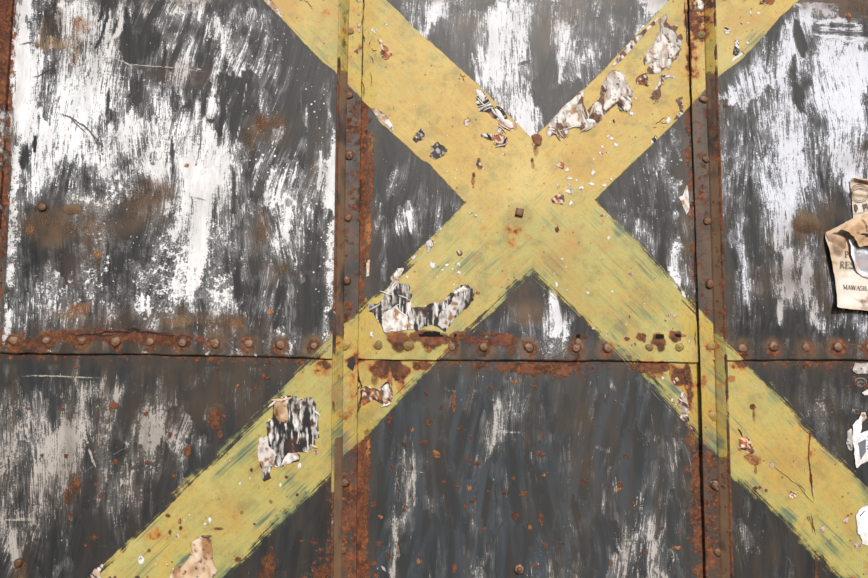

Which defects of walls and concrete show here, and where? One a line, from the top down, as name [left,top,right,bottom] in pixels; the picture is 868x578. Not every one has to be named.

peeling [475,89,517,155]
peeling [527,14,685,206]
corrosion [363,142,375,266]
peeling [368,227,480,339]
corrosion [15,328,182,349]
peeling [358,382,393,407]
corrosion [371,330,524,388]
corrosion [624,330,692,402]
peeling [239,395,321,487]
corrosion [359,431,383,528]
peeling [155,517,218,578]